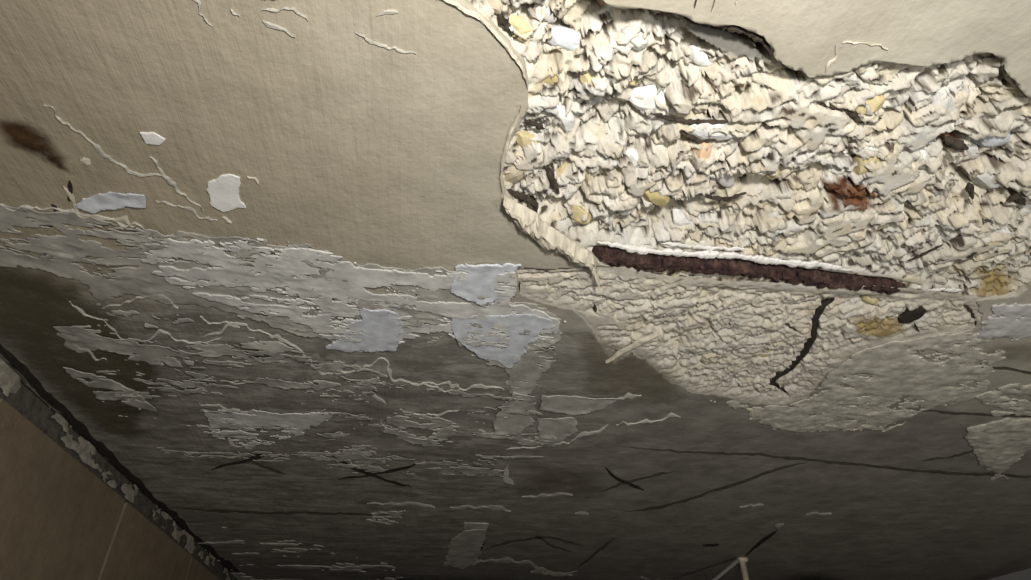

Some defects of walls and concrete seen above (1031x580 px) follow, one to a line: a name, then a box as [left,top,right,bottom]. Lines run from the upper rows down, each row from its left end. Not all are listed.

rust [2,123,64,169]
spalling [0,0,1031,450]
rust [822,175,876,211]
water stain [0,269,160,435]
crack [769,297,835,393]
crack [0,344,386,573]
peeling [156,403,547,485]
crack [332,456,417,487]
crack [598,446,1031,512]
peeling [965,417,1031,480]
peeling [198,540,403,580]
water stain [479,557,577,577]